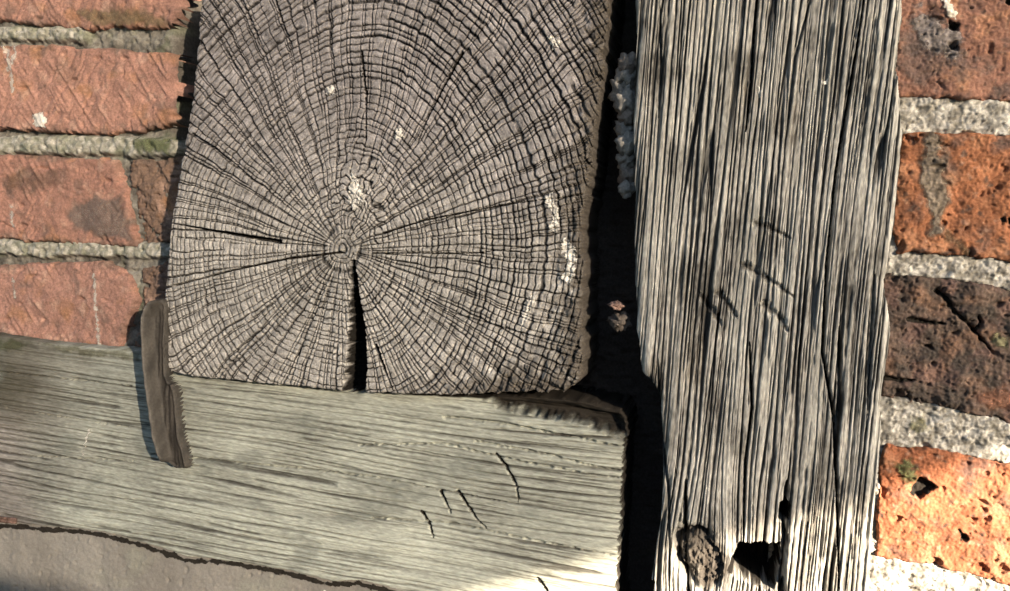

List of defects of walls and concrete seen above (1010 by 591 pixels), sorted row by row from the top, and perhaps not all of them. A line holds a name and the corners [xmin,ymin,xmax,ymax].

crack [906,289,991,351]